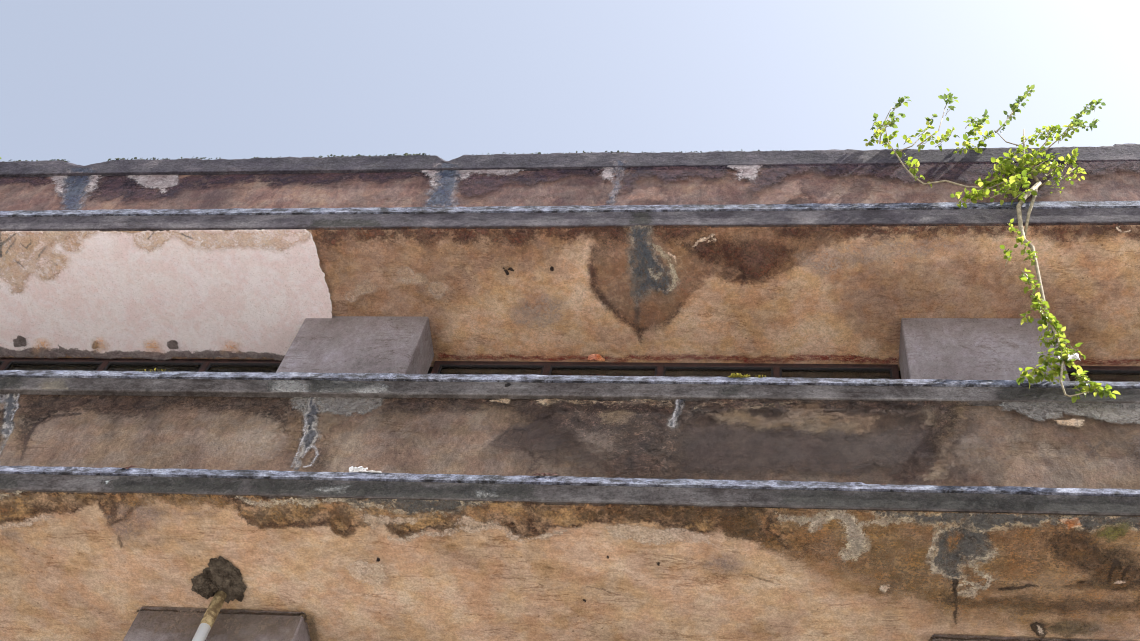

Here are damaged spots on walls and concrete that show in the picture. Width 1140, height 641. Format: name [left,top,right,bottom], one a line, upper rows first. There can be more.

water stain [0,231,96,292]
water stain [0,336,285,361]
peeling [0,229,332,358]
water stain [112,212,1014,337]
peeling [1000,402,1140,427]
water stain [0,377,1140,641]